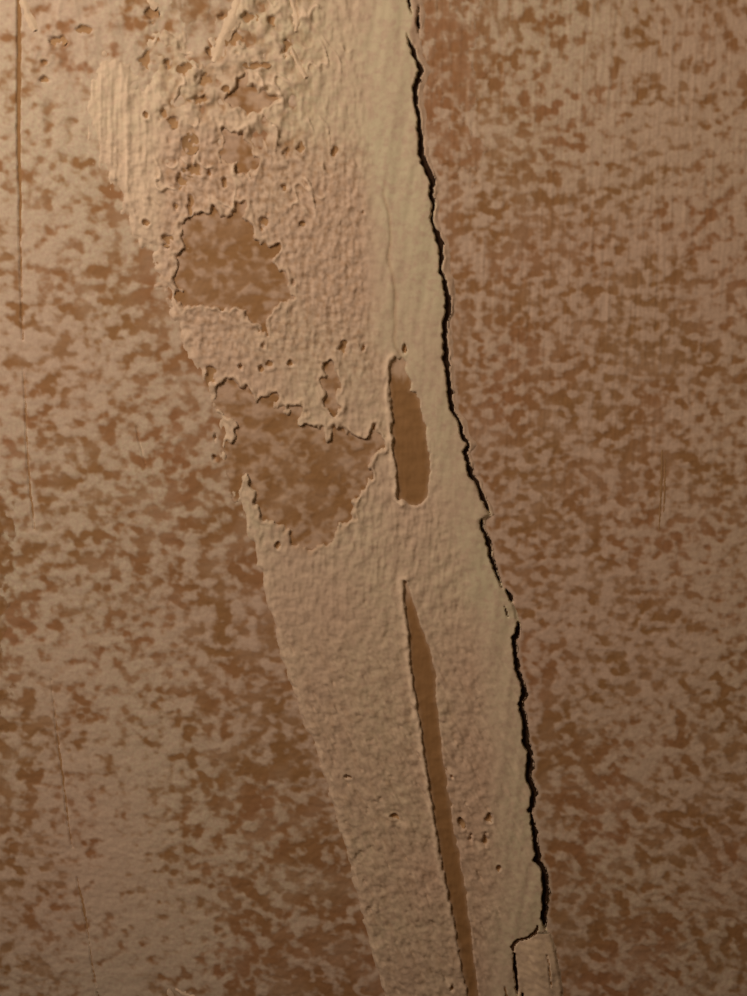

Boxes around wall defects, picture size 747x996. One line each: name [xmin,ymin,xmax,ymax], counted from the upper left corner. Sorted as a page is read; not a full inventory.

spalling [165,60,193,76]
peeling [187,61,278,115]
peeling [142,109,295,347]
peeling [205,344,430,550]
crack [407,0,550,996]
hole [404,582,478,996]